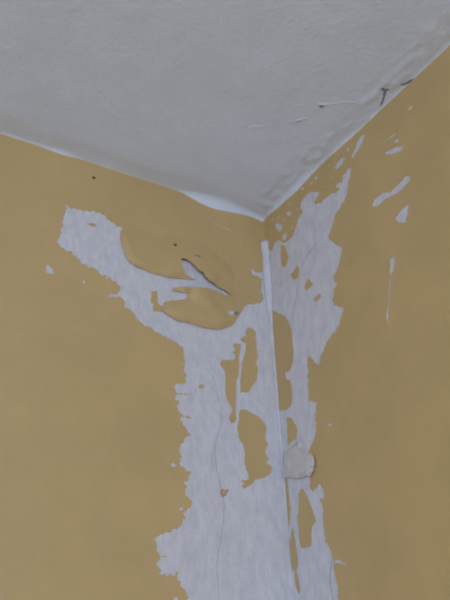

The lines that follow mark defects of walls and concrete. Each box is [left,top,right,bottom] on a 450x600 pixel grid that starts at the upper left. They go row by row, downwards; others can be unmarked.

crack [380,79,413,106]
peeling [372,176,410,207]
peeling [396,205,408,223]
peeling [57,134,365,600]